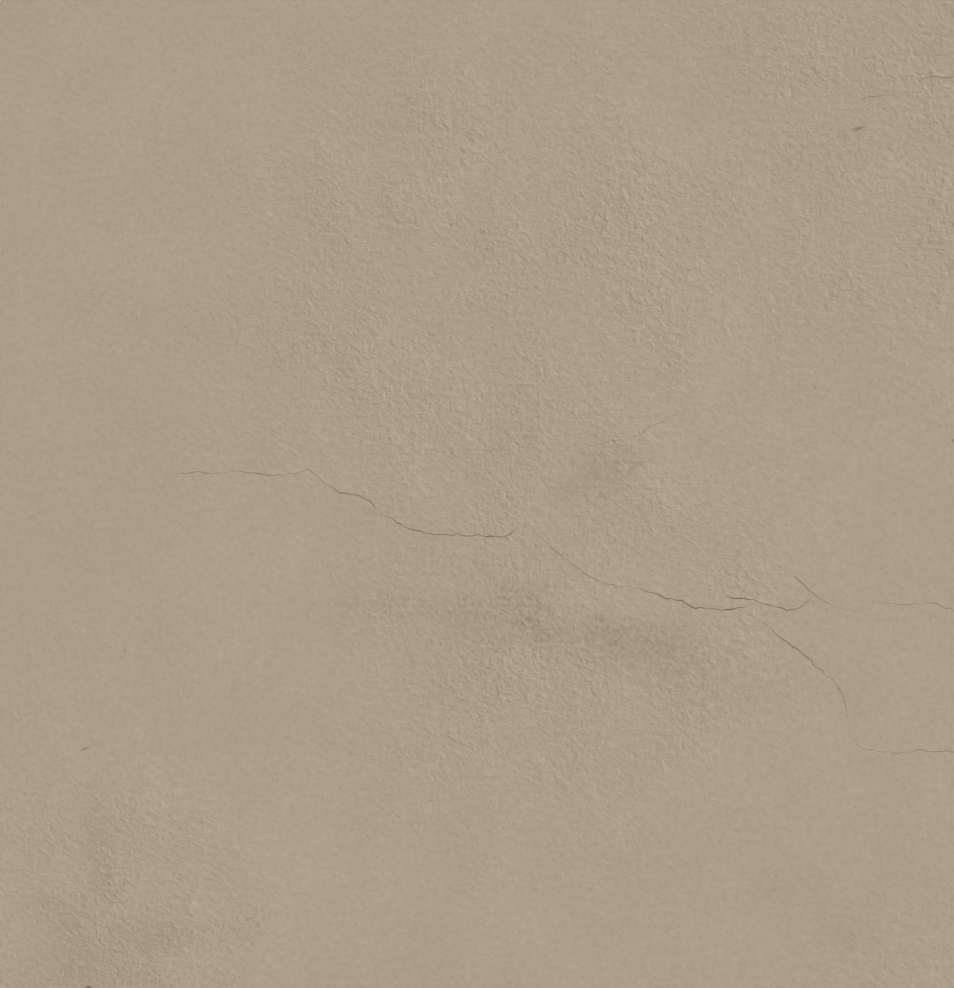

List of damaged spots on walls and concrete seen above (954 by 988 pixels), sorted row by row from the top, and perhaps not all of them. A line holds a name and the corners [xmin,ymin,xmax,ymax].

crack [182,469,906,719]